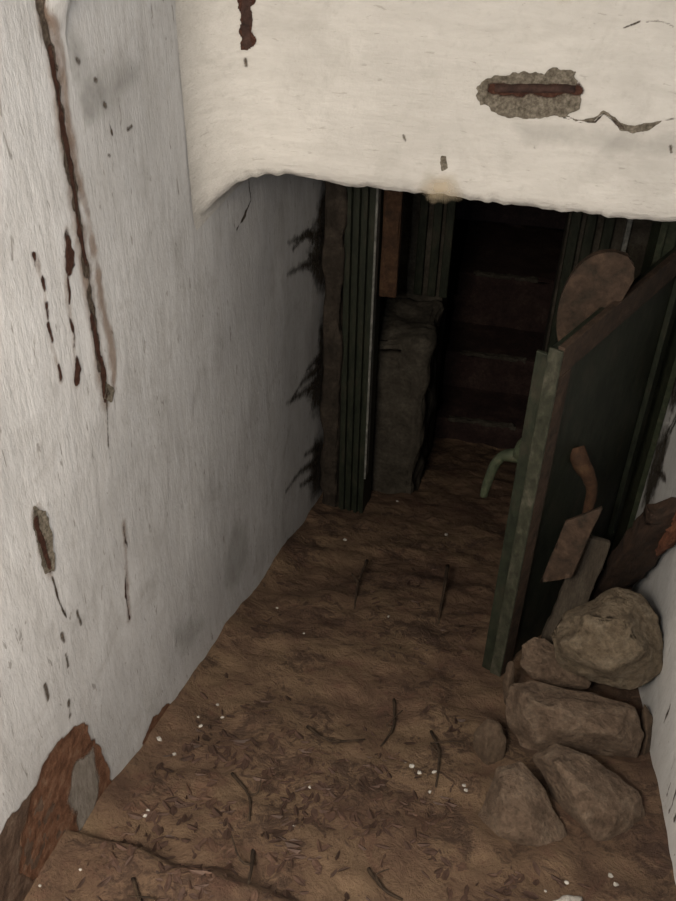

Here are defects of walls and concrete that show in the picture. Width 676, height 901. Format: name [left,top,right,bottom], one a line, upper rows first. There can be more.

spalling [237,0,256,67]
spalling [476,67,584,119]
crack [564,110,673,134]
spalling [33,506,55,574]
peeling [0,723,112,901]